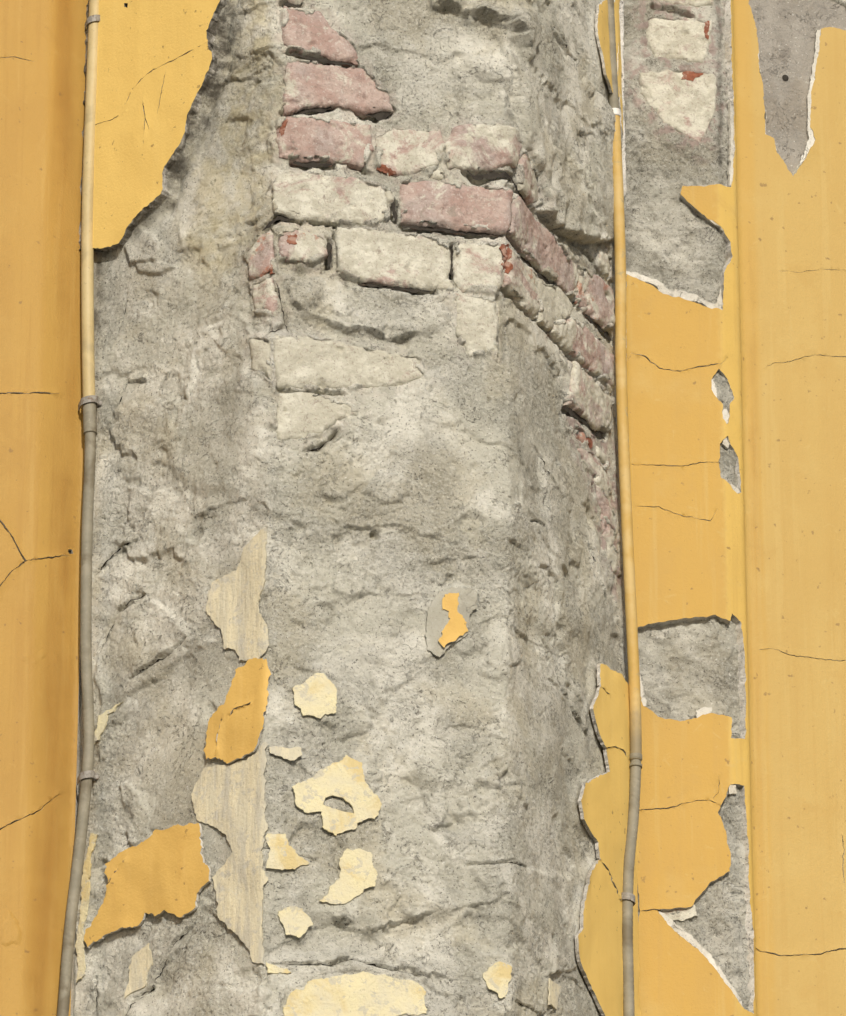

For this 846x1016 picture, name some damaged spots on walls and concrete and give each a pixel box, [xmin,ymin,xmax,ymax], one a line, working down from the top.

spalling [748,0,846,175]
spalling [595,0,734,310]
flaking render [246,0,619,573]
crack [0,521,60,586]
peeling [204,658,302,764]
peeling [292,673,337,719]
spalling [638,617,741,739]
peeling [291,755,382,836]
peeling [75,823,211,982]
peeling [319,848,378,905]
spalling [658,785,751,1011]
peeling [282,971,427,1016]